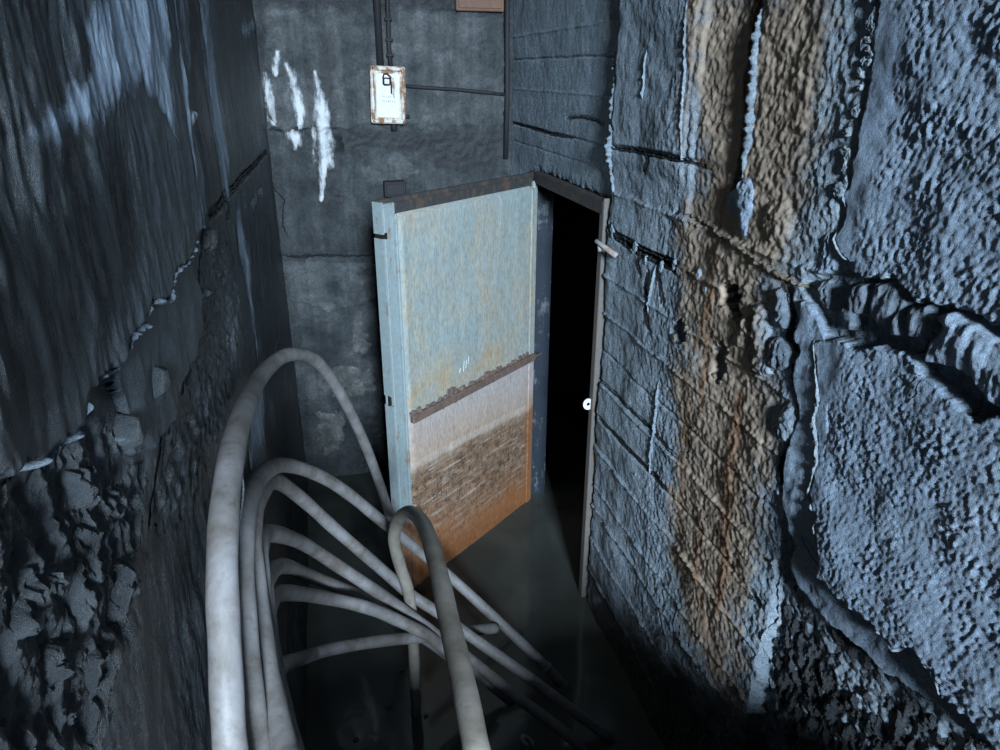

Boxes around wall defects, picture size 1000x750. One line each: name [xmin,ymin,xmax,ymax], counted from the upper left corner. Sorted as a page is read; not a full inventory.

damp [265,38,501,202]
damp [727,178,754,237]
corrosion [668,0,823,693]
crack [784,281,800,415]
crack [906,325,999,416]
crack [778,445,790,490]